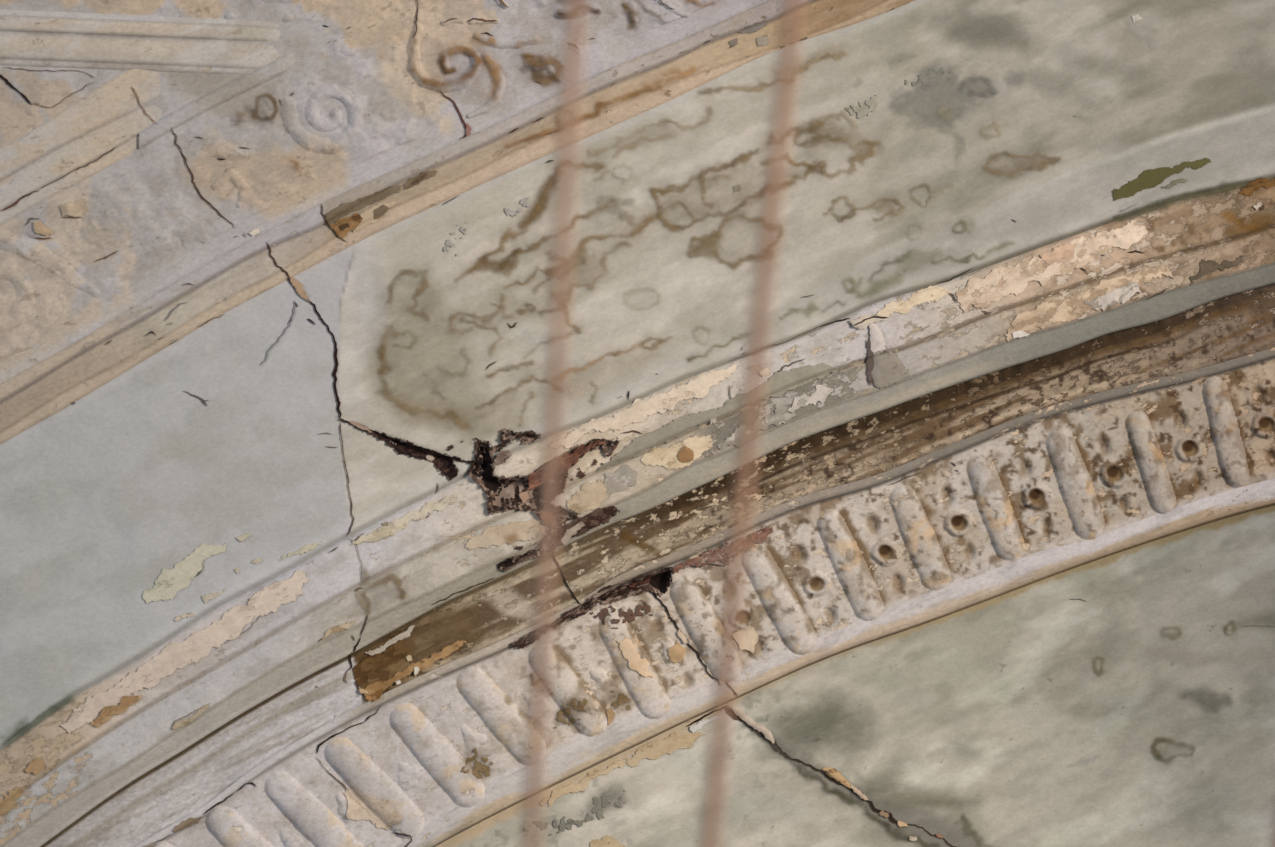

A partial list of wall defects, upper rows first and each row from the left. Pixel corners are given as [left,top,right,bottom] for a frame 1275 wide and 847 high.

crack [0,67,95,108]
crack [3,147,116,211]
leakage [472,167,558,271]
leakage [631,152,769,269]
leakage [781,155,832,188]
leakage [788,95,877,173]
crack [131,86,475,578]
peeling [756,358,842,431]
flaking render [447,346,744,572]
peeling [61,493,459,734]
crack [652,592,957,847]
peeling [143,817,201,847]